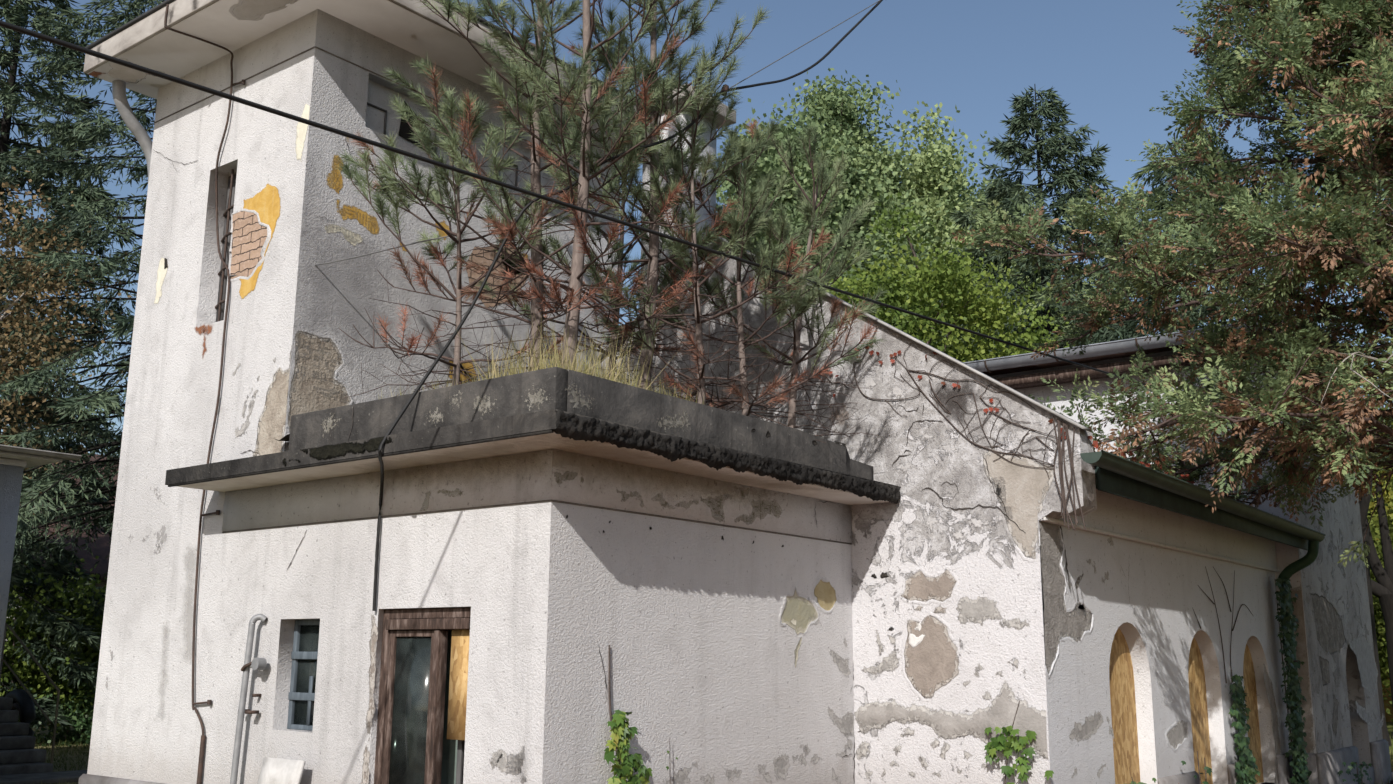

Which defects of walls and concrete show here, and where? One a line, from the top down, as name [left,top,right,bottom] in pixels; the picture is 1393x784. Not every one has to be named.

peeling [324,155,379,246]
flaking render [229,184,281,299]
rust [195,325,212,355]
spalling [234,328,354,467]
peeling [863,373,907,403]
peeling [617,486,788,525]
spalling [828,418,1109,702]
peeling [778,576,837,668]
peeling [489,747,525,783]
peeling [865,761,916,779]
peeling [933,750,988,777]